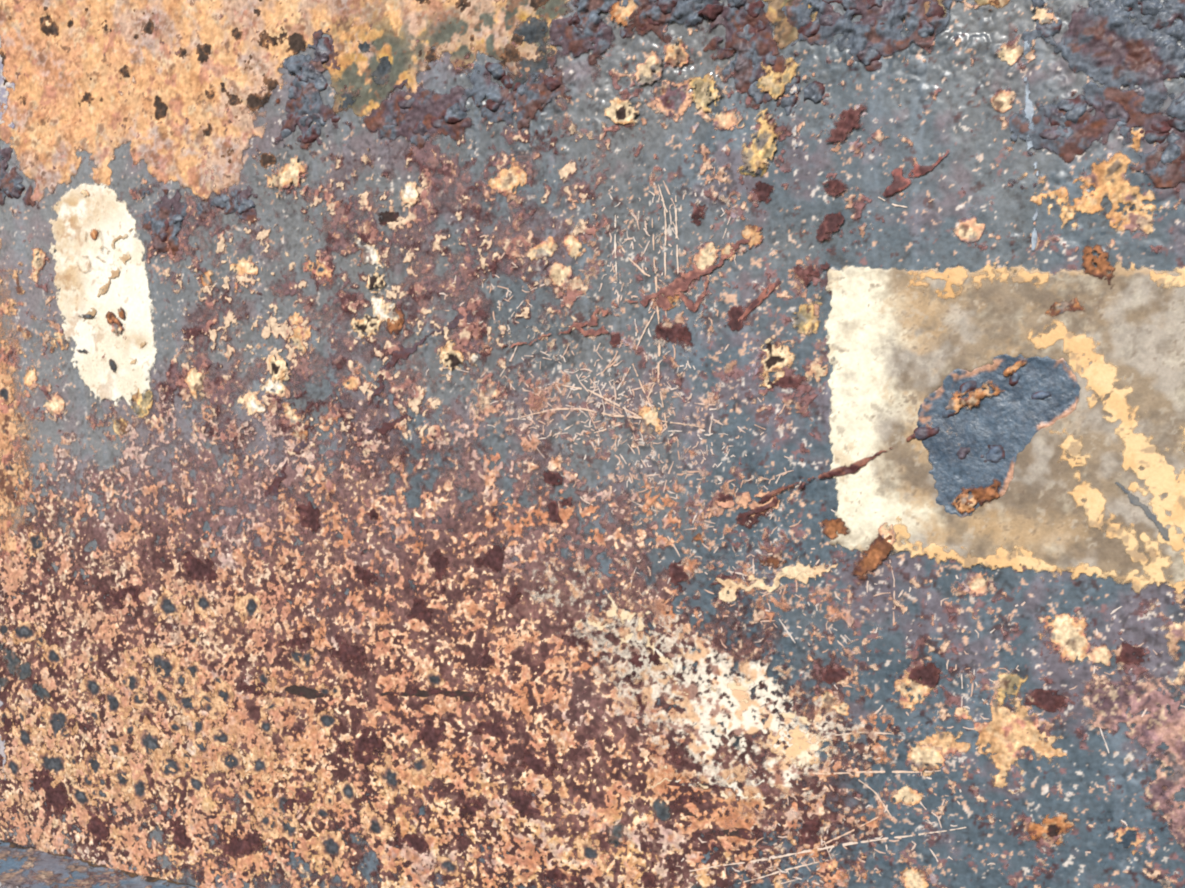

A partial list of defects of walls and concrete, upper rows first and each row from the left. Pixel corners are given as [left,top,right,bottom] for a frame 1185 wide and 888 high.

corrosion [962,0,1009,11]
corrosion [1007,28,1035,70]
corrosion [0,0,933,888]
peeling [913,354,1081,518]
corrosion [910,570,941,627]
corrosion [944,572,1019,647]
corrosion [991,813,1074,888]
corrosion [1114,823,1181,888]